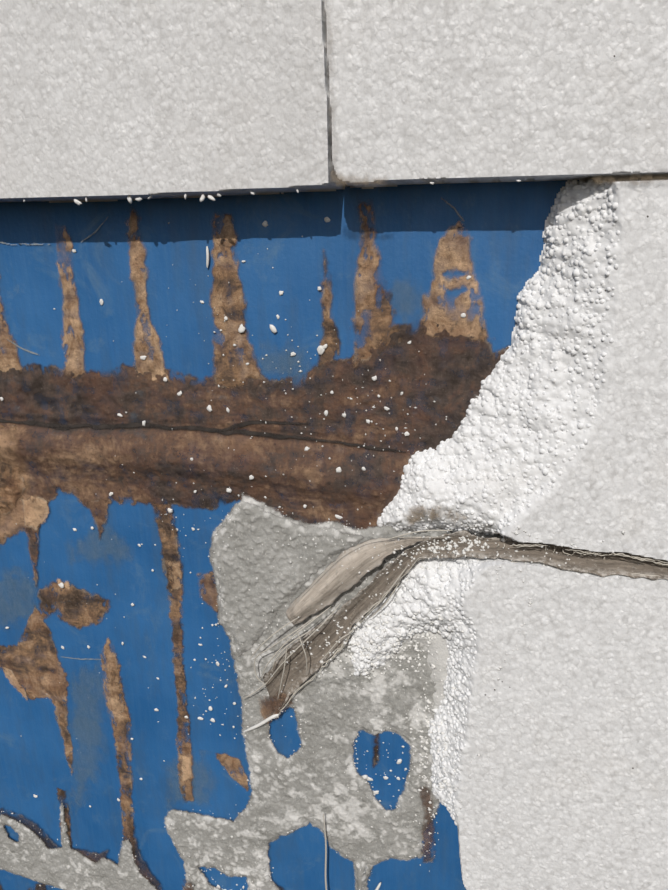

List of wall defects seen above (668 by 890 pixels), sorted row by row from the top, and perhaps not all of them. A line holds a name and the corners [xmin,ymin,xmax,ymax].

spalling [0,0,668,543]
corrosion [0,788,107,863]
peeling [0,579,109,773]
corrosion [101,639,160,890]
crack [0,419,405,452]
corrosion [0,203,509,801]
peeling [212,501,364,656]
spalling [348,556,628,890]